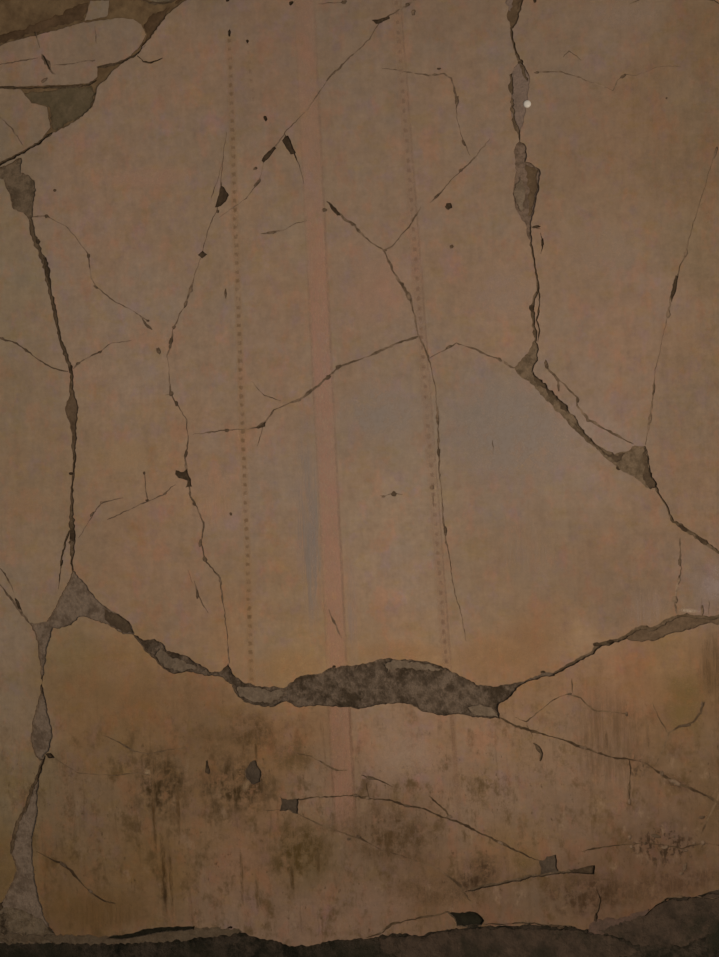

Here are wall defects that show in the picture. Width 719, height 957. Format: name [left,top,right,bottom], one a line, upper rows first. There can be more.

spalling [505,0,536,30]
peeling [0,0,146,221]
spalling [508,64,541,246]
crack [0,0,513,663]
spalling [513,340,657,489]
crack [529,147,718,445]
crack [10,735,190,904]
water stain [139,755,186,908]
water stain [202,757,268,812]
water stain [269,822,326,889]
flaking render [0,571,719,957]
crack [266,486,719,938]